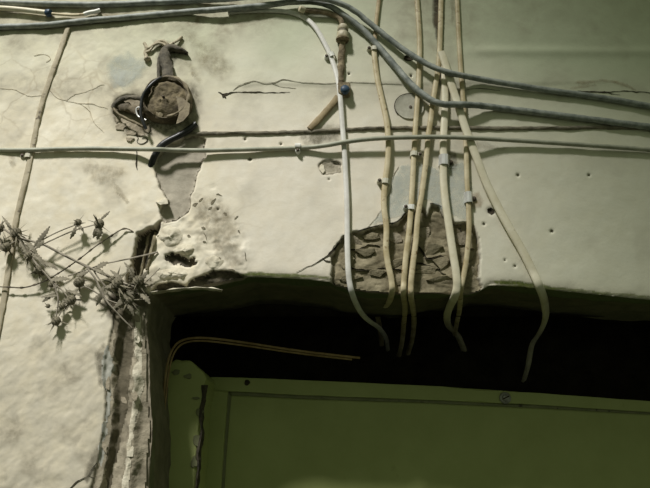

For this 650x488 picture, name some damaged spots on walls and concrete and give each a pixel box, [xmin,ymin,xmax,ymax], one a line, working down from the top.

crack [219,79,331,98]
spalling [113,109,150,142]
spalling [155,137,206,223]
spalling [319,160,341,175]
spalling [128,229,159,277]
spalling [165,253,197,267]
spalling [332,166,481,293]
spalling [92,269,242,488]